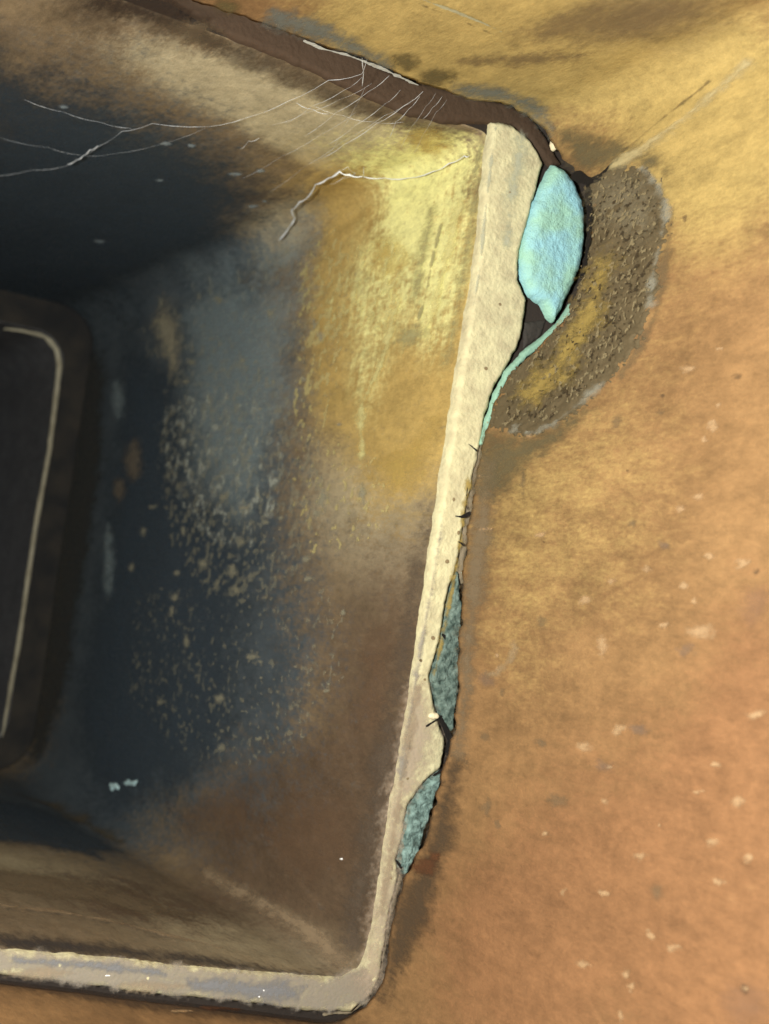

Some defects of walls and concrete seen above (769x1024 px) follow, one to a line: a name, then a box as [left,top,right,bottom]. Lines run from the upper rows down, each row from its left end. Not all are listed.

spalling [487,165,676,437]